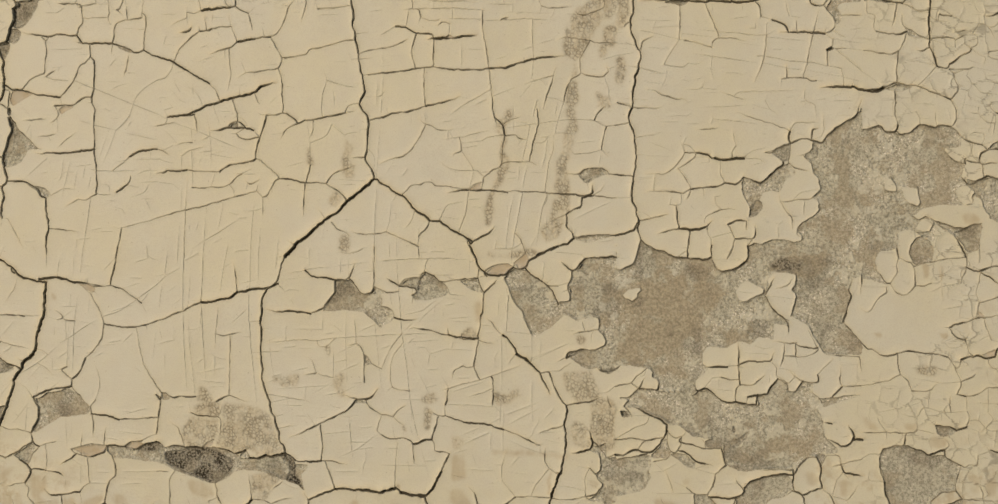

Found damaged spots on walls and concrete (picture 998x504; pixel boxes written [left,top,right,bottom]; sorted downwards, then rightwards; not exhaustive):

peeling [5,91,37,168]
crack [647,90,863,260]
crack [641,0,998,182]
peeling [34,389,91,432]
peeling [73,441,308,491]
peeling [324,281,394,328]
crack [0,0,744,504]
peeling [402,272,448,301]
peeling [462,109,998,504]
crack [697,278,820,406]
crack [748,290,998,504]
crack [860,246,998,313]